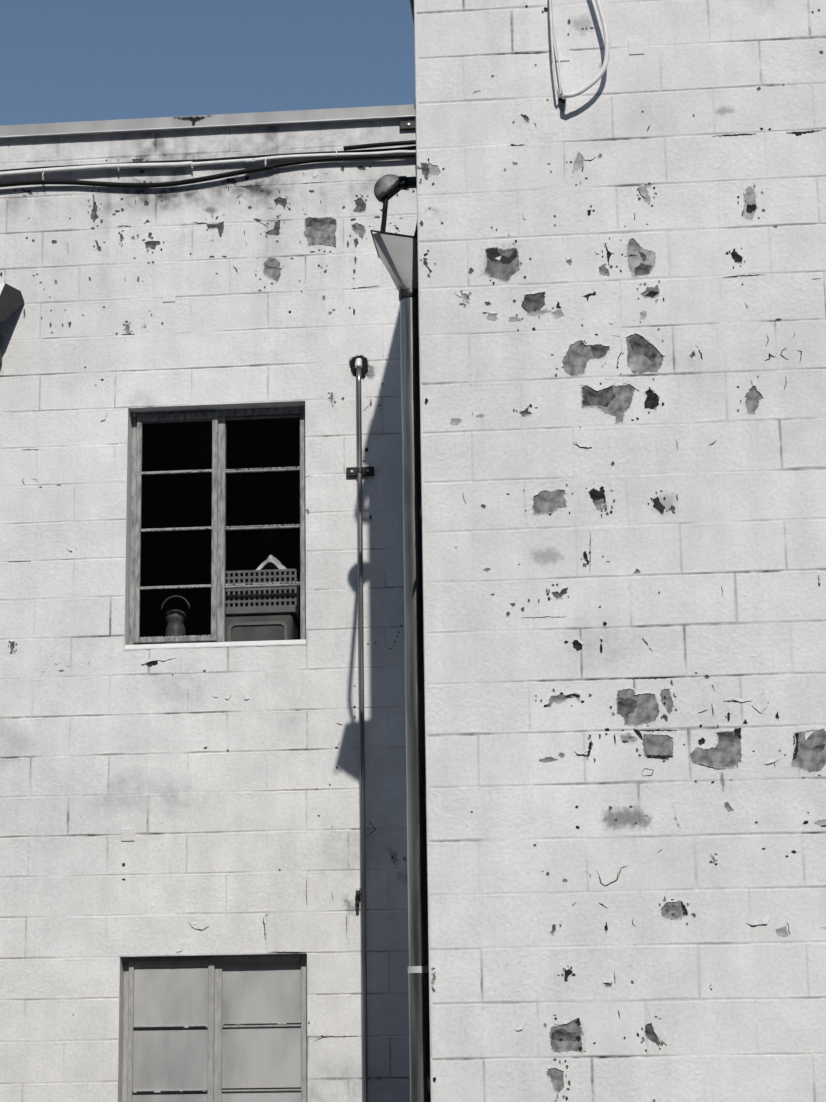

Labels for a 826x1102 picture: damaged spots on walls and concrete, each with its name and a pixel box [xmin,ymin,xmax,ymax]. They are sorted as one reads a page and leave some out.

peeling [255,257,293,288]
peeling [248,191,402,279]
peeling [468,226,532,285]
peeling [482,289,564,331]
peeling [551,226,665,424]
peeling [523,484,573,515]
peeling [586,482,615,518]
peeling [535,689,592,707]
peeling [610,680,779,783]
peeling [779,729,826,778]
peeling [624,1012,668,1051]
peeling [544,1013,596,1101]